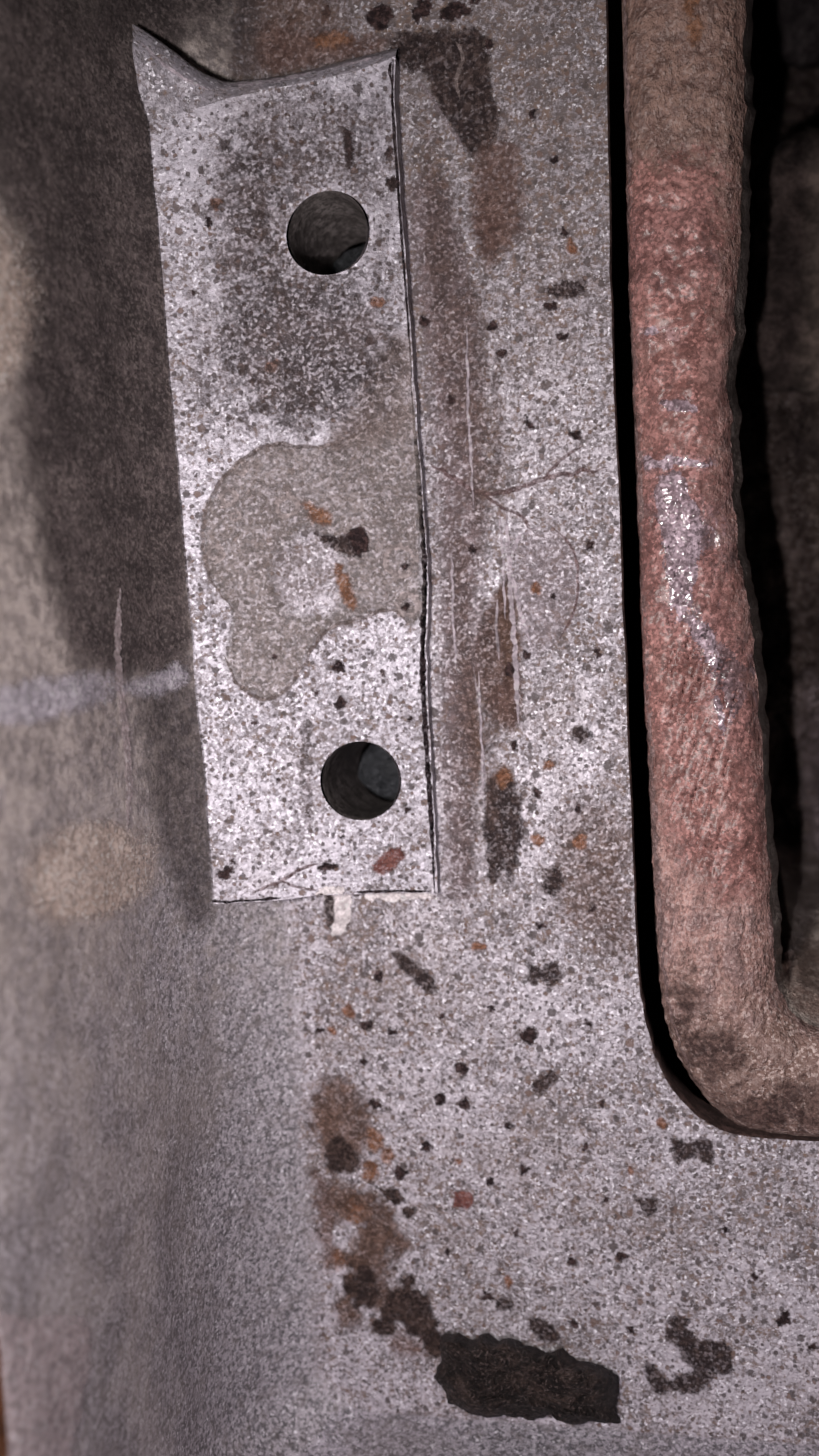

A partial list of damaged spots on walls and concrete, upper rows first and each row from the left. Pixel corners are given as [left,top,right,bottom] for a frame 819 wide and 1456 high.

corrosion [462,578,544,883]
corrosion [311,1076,441,1358]